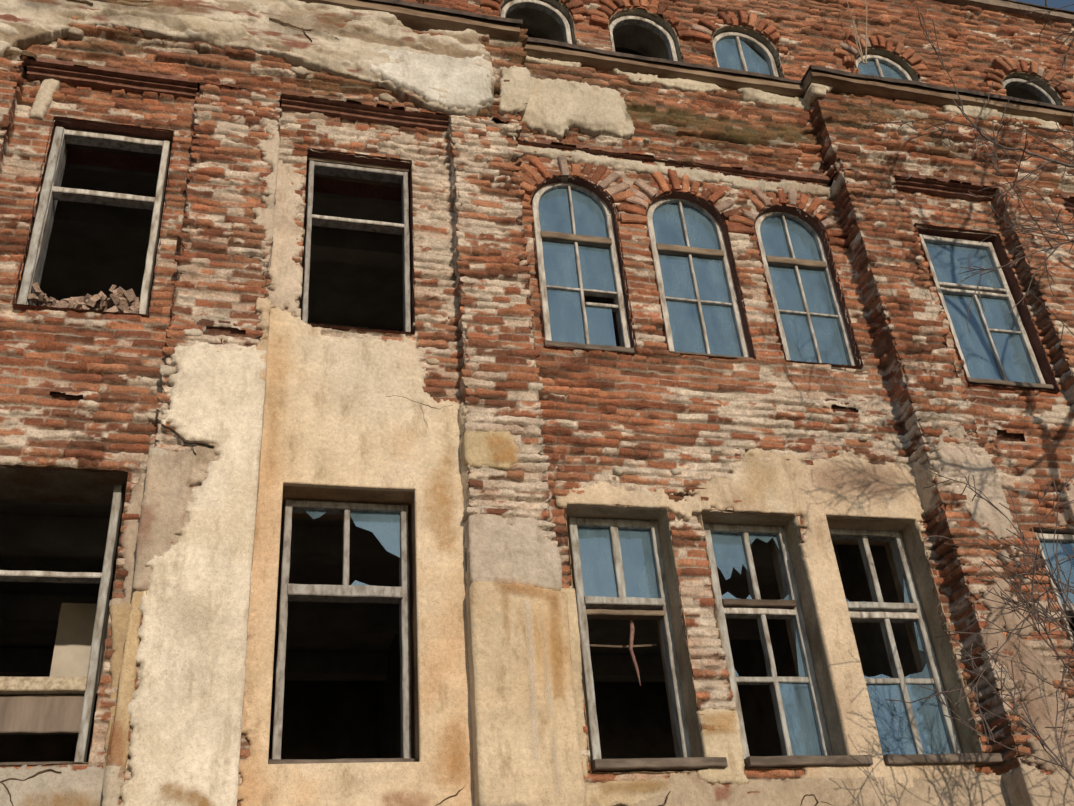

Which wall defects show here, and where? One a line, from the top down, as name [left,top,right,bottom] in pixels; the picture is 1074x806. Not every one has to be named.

crack [69,0,153,8]
peeling [0,0,845,200]
peeling [0,130,588,806]
spalling [823,398,859,418]
peeling [466,425,1074,806]
crack [0,769,61,806]